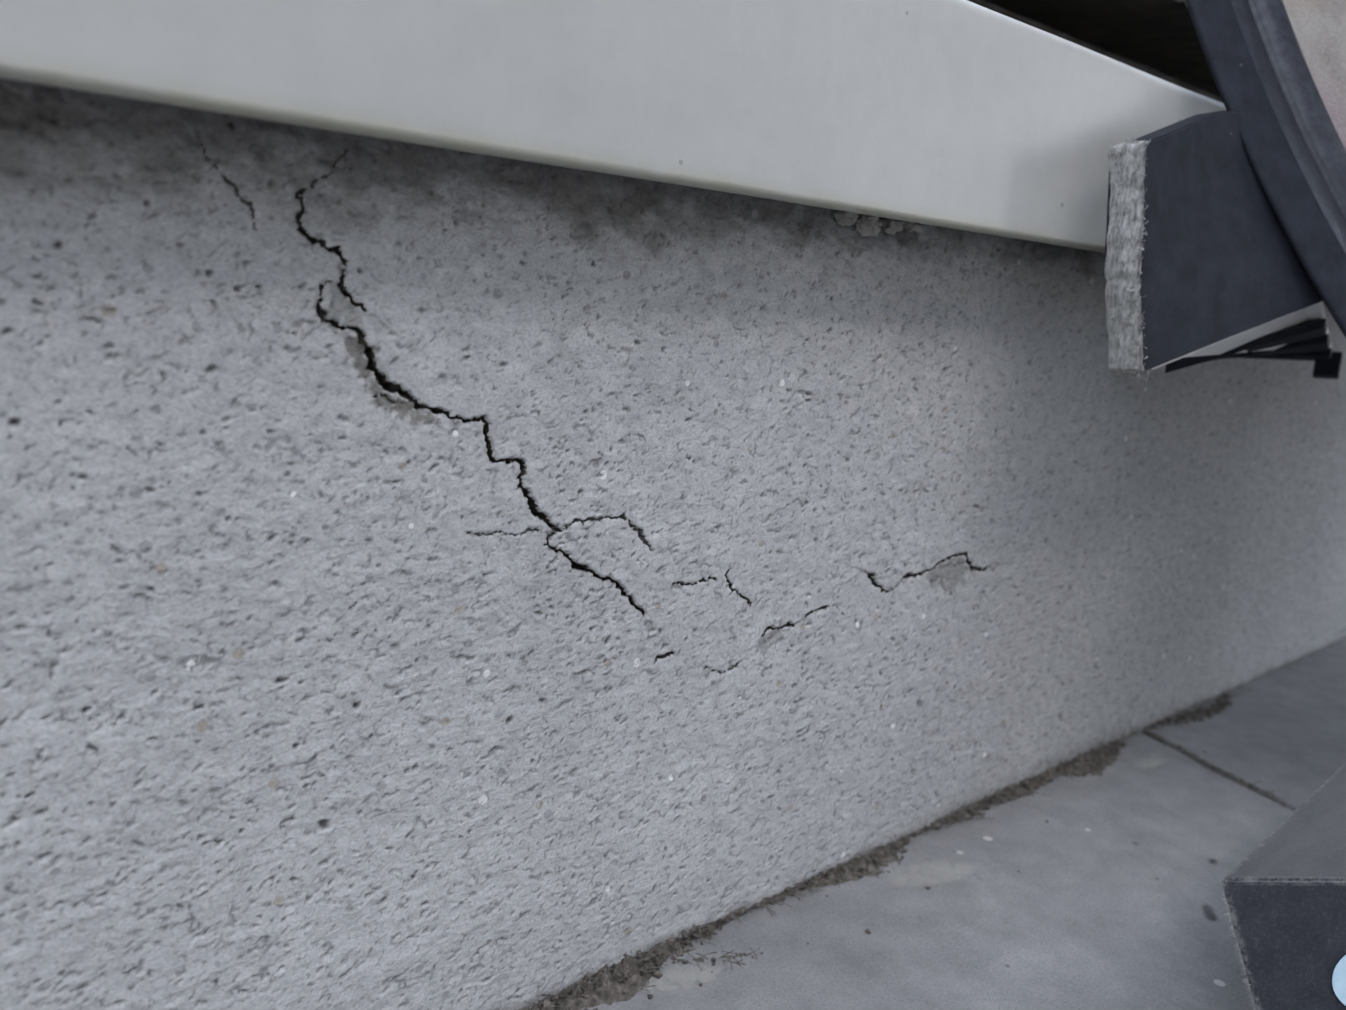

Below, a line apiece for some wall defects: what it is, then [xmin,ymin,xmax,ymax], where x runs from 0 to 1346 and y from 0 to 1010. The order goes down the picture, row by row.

crack [197,131,257,231]
crack [295,159,651,615]
crack [672,567,828,637]
crack [867,552,989,593]
crack [655,651,674,662]
crack [704,662,739,673]